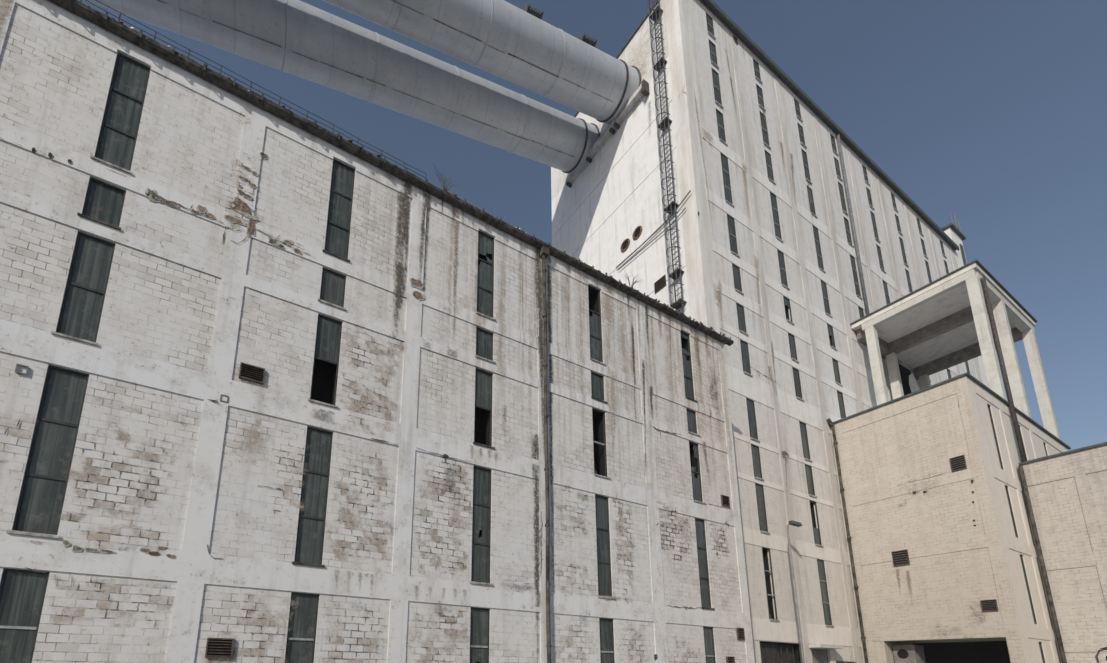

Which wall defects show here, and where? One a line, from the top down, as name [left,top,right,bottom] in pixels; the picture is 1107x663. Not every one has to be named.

damp [179,9,574,157]
damp [391,0,613,102]
spalling [145,188,179,208]
spalling [191,163,260,239]
spalling [269,237,304,255]
damp [394,183,464,327]
peeling [342,336,404,431]
spalling [63,531,175,558]
peeling [74,442,166,515]
peeling [417,454,470,569]
peeling [657,507,690,560]